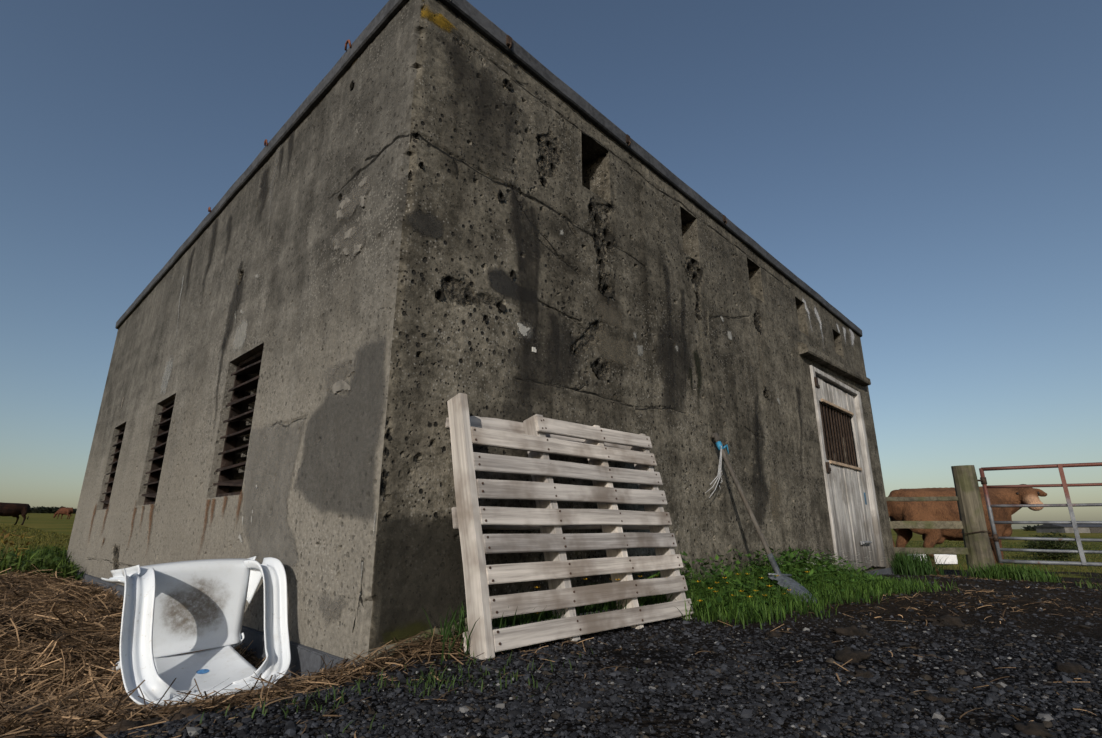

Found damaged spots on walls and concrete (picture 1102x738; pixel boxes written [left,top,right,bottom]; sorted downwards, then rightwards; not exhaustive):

spalling [536,129,560,187]
crack [430,20,787,287]
peeling [332,177,370,257]
crack [328,132,646,275]
spalling [588,199,617,304]
crack [534,297,587,331]
crack [515,378,684,422]
rust [204,492,242,529]